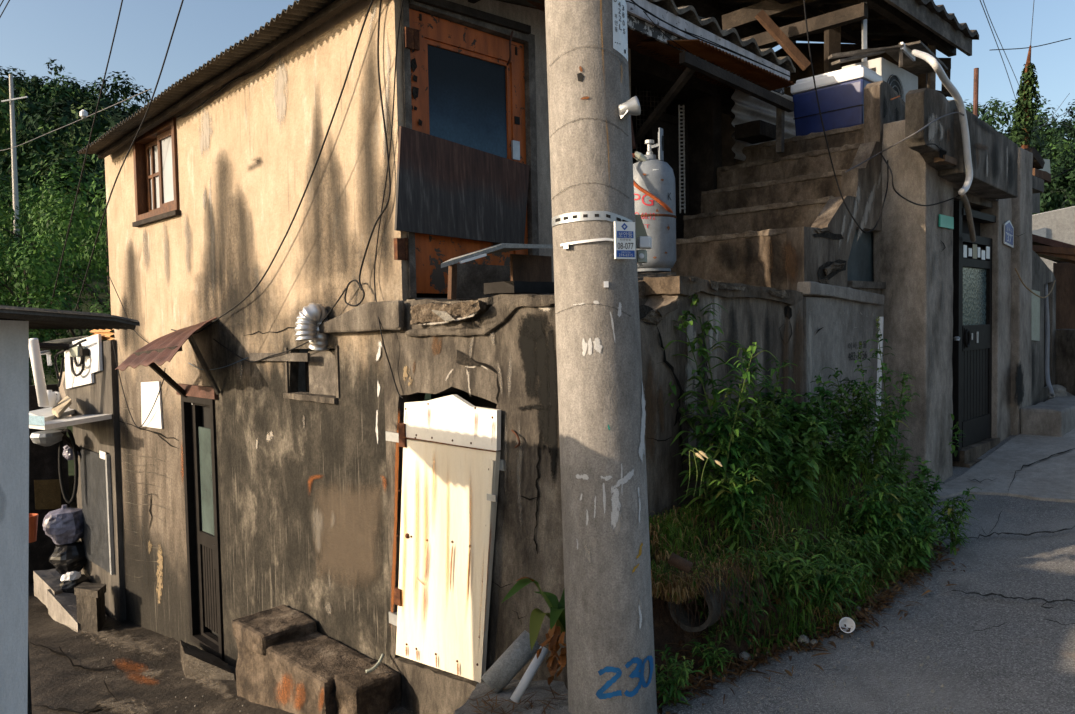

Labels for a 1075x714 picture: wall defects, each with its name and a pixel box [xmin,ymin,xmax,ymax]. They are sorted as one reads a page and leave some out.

leakage [203,161,258,328]
leakage [305,115,352,277]
leakage [498,313,558,481]
peeling [147,541,163,604]
leakage [314,511,334,550]
rust [383,412,496,613]
crack [521,431,542,554]
crack [951,590,1075,631]
crack [962,448,1075,539]
crack [30,642,130,714]